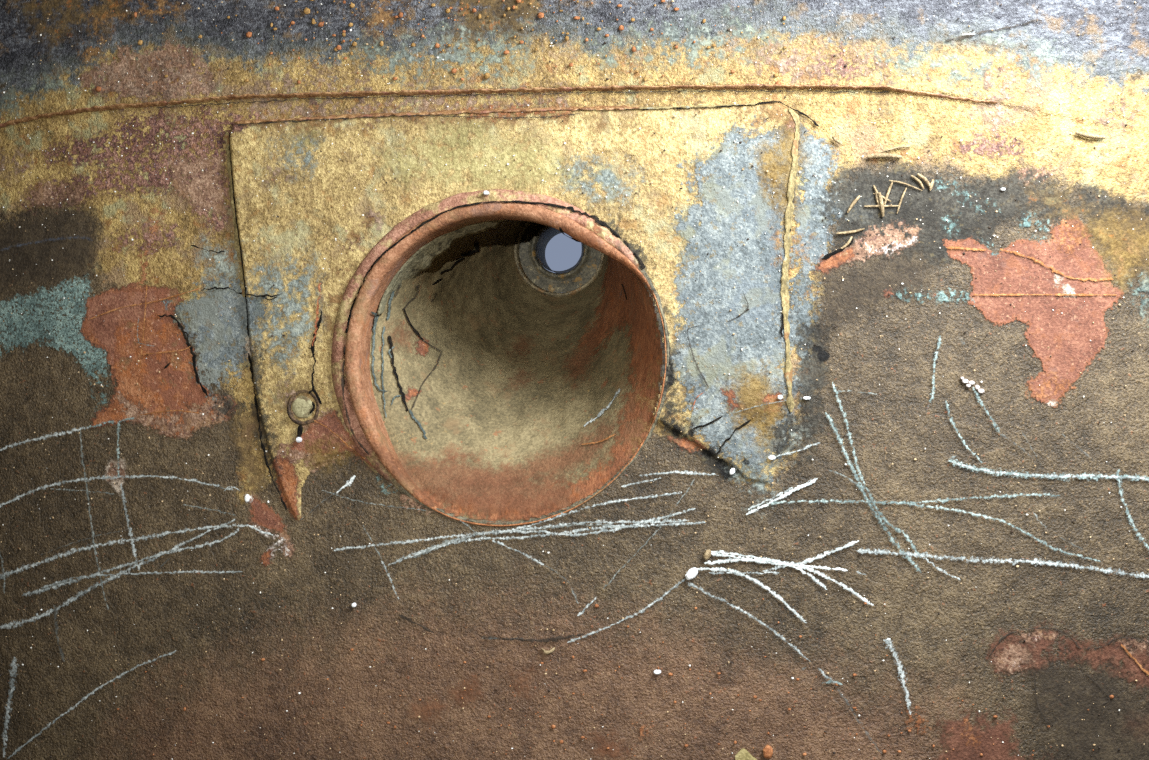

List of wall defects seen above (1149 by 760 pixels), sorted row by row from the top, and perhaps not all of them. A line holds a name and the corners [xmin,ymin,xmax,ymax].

crack [201,287,280,300]
corrosion [0,0,666,566]
crack [158,314,208,396]